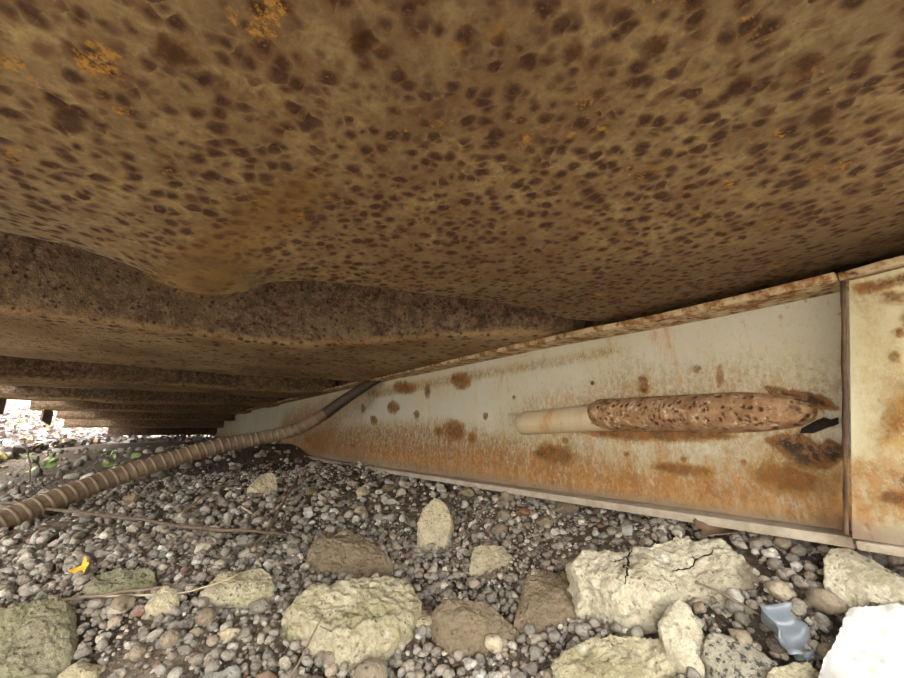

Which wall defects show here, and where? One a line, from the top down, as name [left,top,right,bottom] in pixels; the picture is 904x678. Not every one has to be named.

corrosion [156,38,189,67]
corrosion [349,33,372,55]
corrosion [642,35,668,57]
corrosion [794,53,820,78]
corrosion [727,76,753,97]
corrosion [808,105,834,129]
corrosion [854,274,904,303]
corrosion [447,372,489,389]
corrosion [612,374,685,399]
corrosion [290,377,904,522]